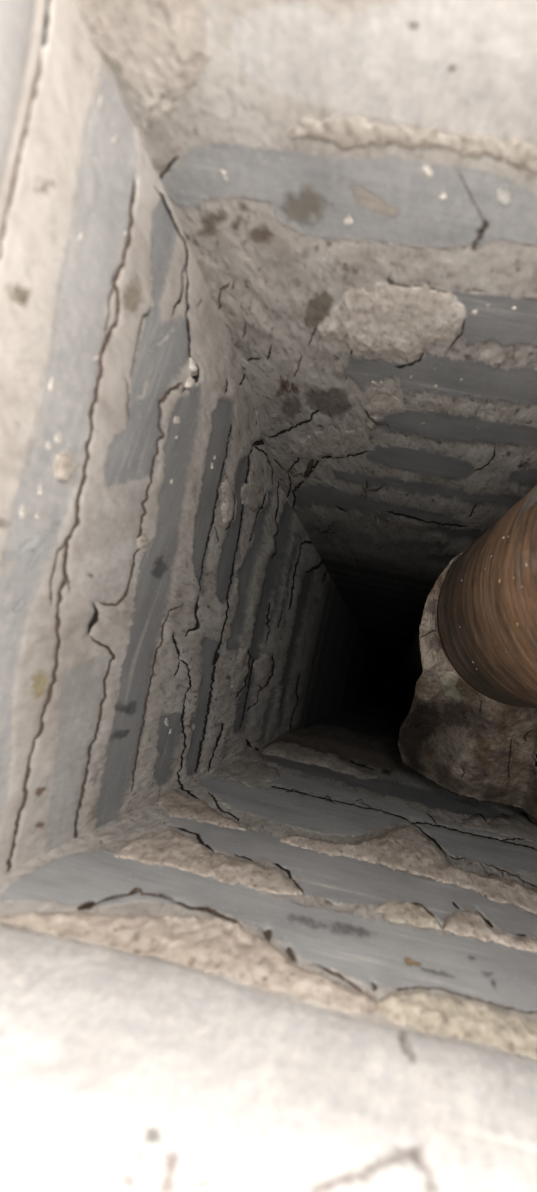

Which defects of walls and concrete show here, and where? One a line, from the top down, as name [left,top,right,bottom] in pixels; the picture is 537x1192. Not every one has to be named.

crack [294,324,317,376]
peeling [317,280,467,363]
crack [394,320,465,369]
peeling [288,381,406,462]
crack [6,156,271,872]
crack [387,504,476,527]
crack [131,410,371,822]
spalling [439,671,461,705]
crack [461,729,534,778]